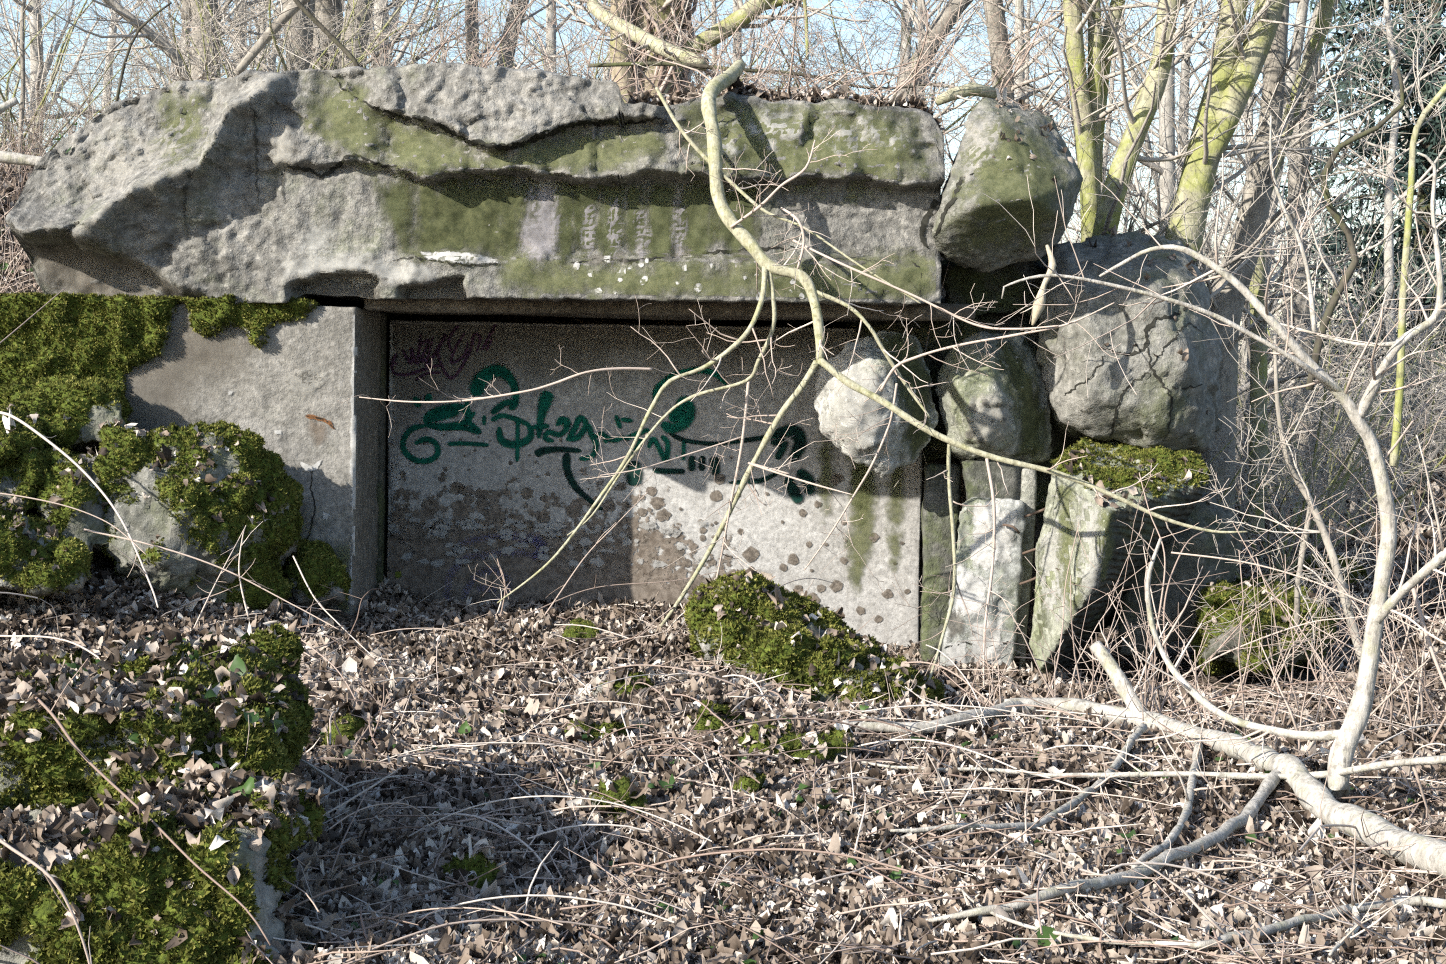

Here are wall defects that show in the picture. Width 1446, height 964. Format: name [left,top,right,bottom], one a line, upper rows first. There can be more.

leakage [283,226,498,285]
leakage [374,182,410,246]
leakage [521,181,758,294]
crack [1065,307,1204,442]
leakage [818,354,904,586]